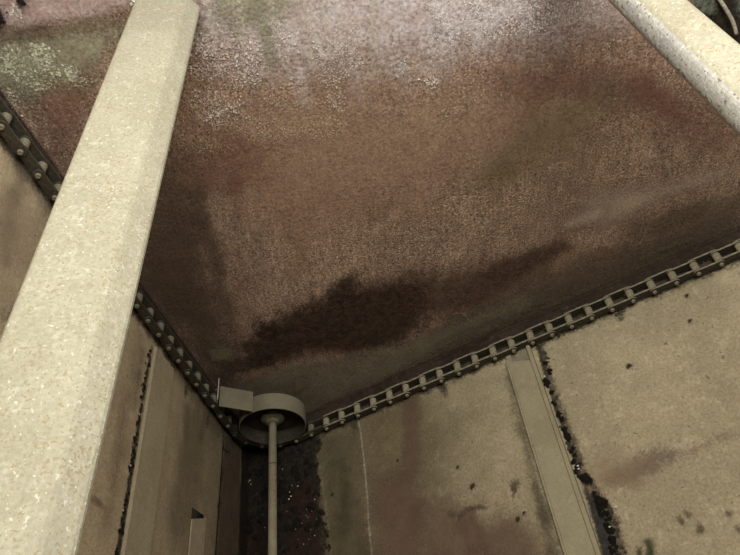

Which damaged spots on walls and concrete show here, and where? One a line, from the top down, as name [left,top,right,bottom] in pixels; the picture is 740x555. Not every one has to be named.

water stain [140,155,740,413]